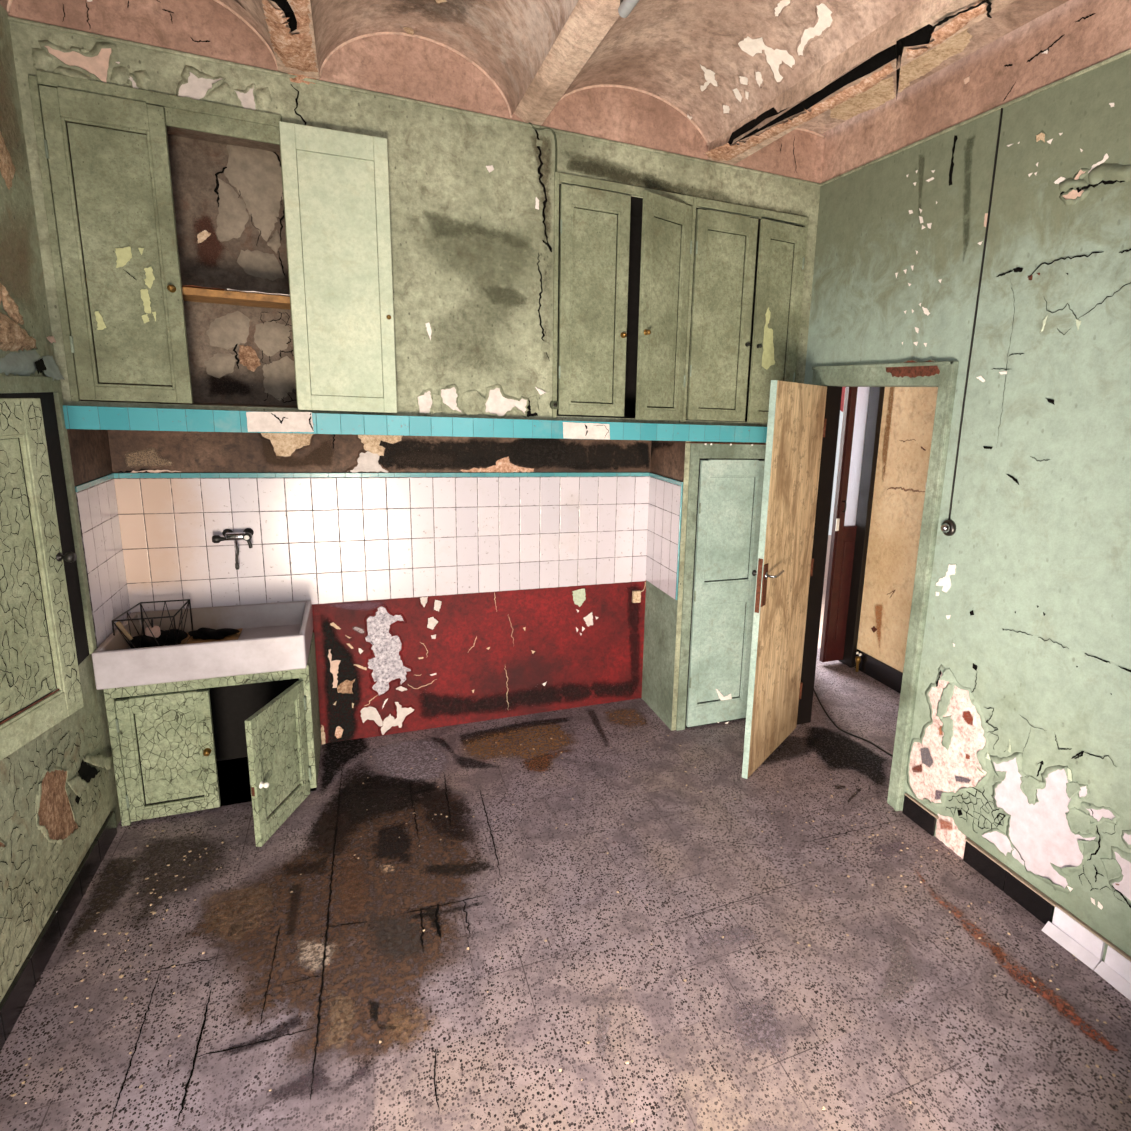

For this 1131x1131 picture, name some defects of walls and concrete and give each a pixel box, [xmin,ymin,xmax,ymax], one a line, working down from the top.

crack [704,0,992,173]
crack [1003,13,1096,101]
peeling [194,144,285,281]
crack [534,129,552,358]
peeling [204,311,318,459]
spalling [345,435,404,473]
peeling [563,422,610,439]
crack [976,249,1131,449]
peeling [328,596,442,736]
peeling [906,664,1131,908]
crack [177,762,364,1122]
corrosion [918,873,1118,1051]